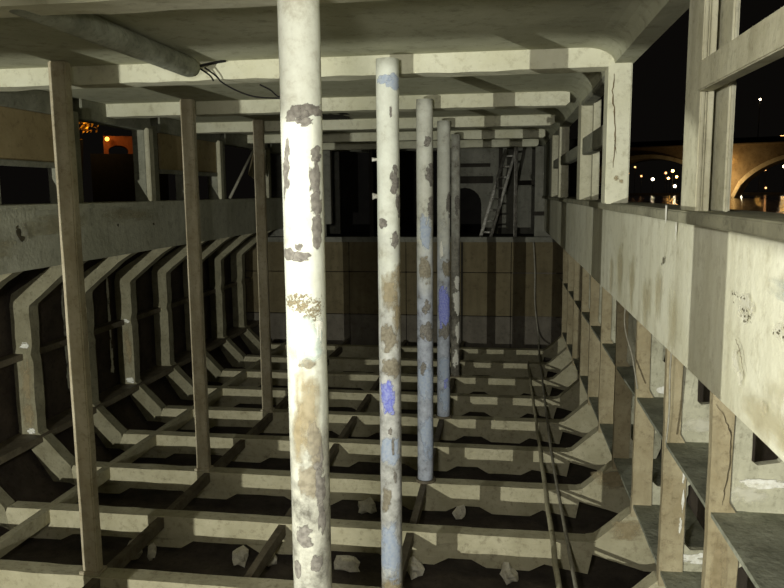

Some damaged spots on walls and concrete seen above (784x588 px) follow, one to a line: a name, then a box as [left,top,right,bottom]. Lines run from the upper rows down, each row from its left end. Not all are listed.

peeling [285,103,350,127]
peeling [377,73,399,90]
crack [610,81,618,162]
peeling [284,145,322,262]
peeling [390,165,400,217]
peeling [425,163,433,220]
corrosion [286,292,322,322]
corrosion [293,380,322,464]
crack [716,404,732,505]
peeling [296,442,326,572]